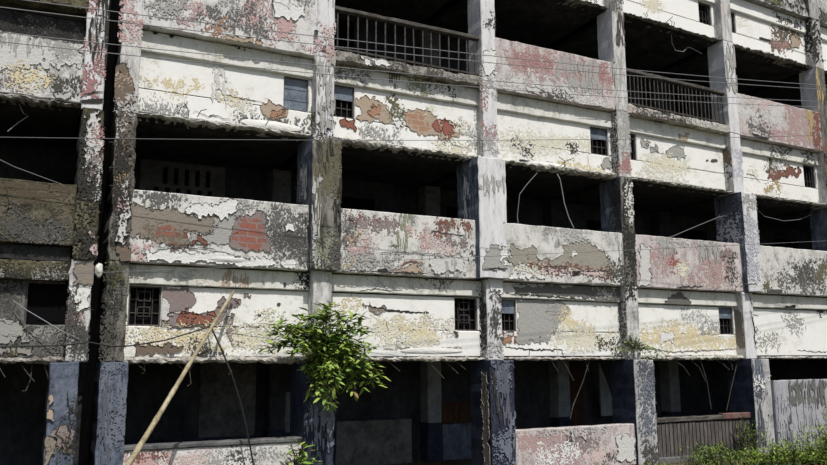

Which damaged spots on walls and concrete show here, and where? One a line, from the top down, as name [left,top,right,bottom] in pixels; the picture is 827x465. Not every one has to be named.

water stain [0,0,111,99]
spalling [0,12,332,143]
flaking render [115,185,272,262]
water stain [211,42,413,291]
flaking render [335,95,482,162]
water stain [431,0,692,357]
spalling [500,152,732,226]
water stain [651,194,827,296]
water stain [746,0,827,188]
water stain [0,262,287,465]
spalling [100,286,310,382]
flaking render [357,239,621,465]